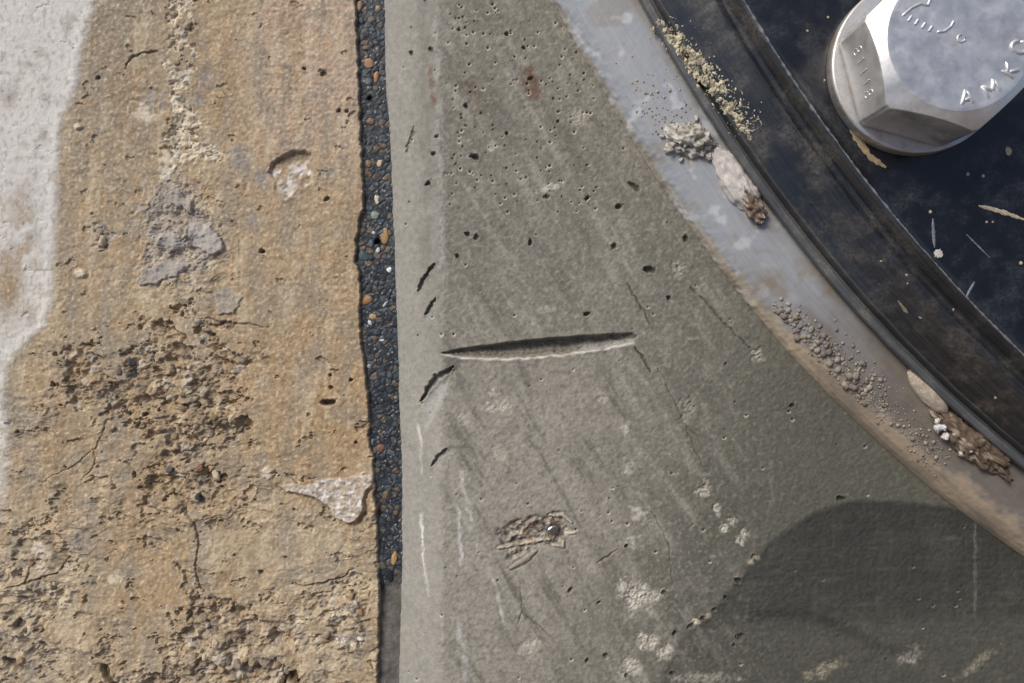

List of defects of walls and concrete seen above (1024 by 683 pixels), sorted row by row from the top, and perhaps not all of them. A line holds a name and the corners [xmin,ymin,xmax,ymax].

spalling [45,0,266,513]
crack [41,419,108,484]
crack [184,507,208,588]
spalling [492,508,577,570]
leakage [803,501,1023,568]
leakage [647,670,757,683]
leakage [800,655,857,683]
leakage [893,641,932,667]
leakage [951,635,1006,683]